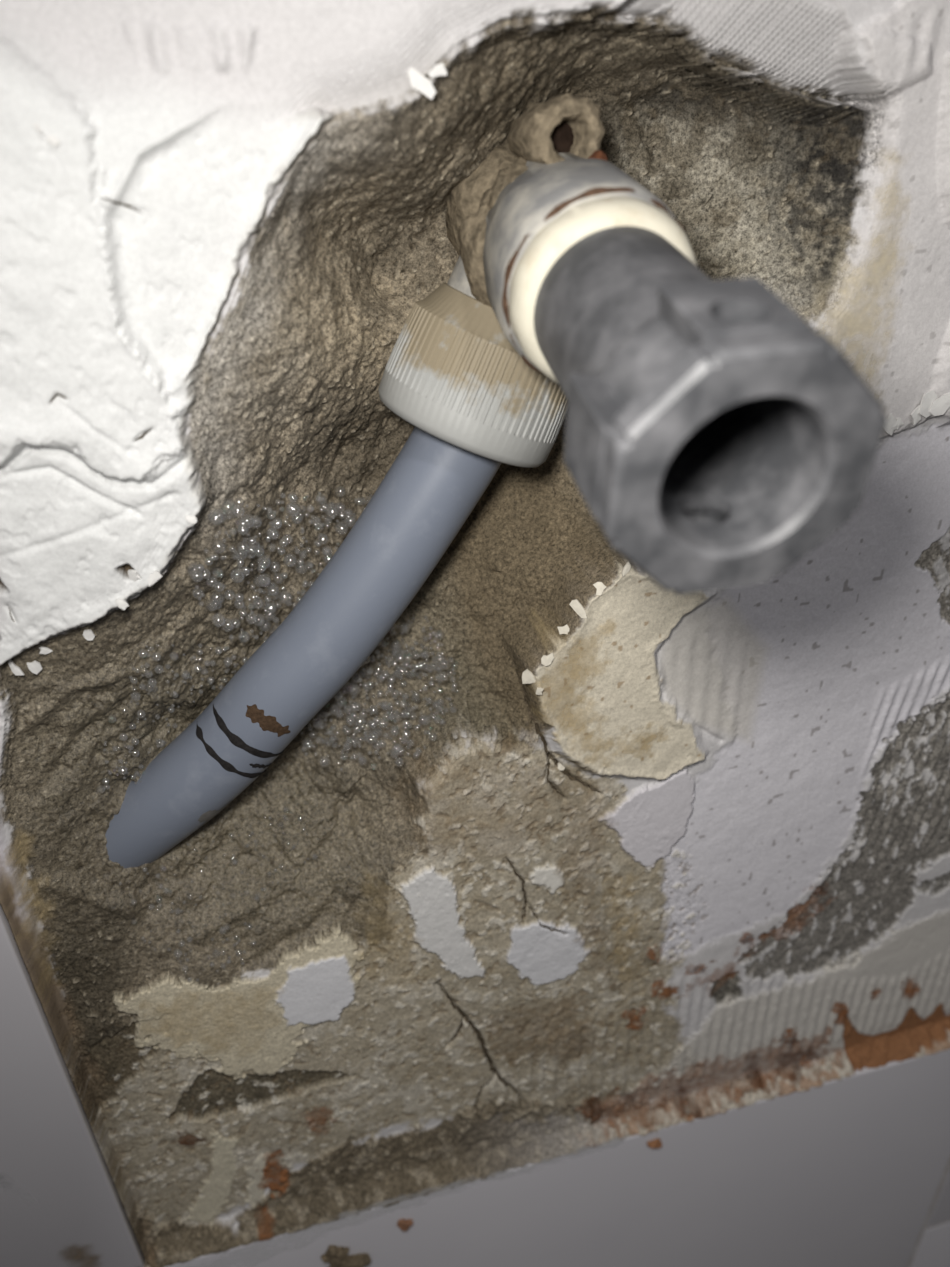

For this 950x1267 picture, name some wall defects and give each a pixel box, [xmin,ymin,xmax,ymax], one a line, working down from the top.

spalling [0,1,890,1056]
spalling [915,527,950,623]
crack [514,662,600,797]
spalling [710,691,950,1005]
spalling [70,1022,157,1126]
peeling [113,923,365,1120]
crack [436,982,521,1114]
rust [622,981,679,1030]
rust [770,1003,849,1070]
spalling [843,1003,950,1071]
rust [902,978,921,999]
spalling [122,1071,774,1267]